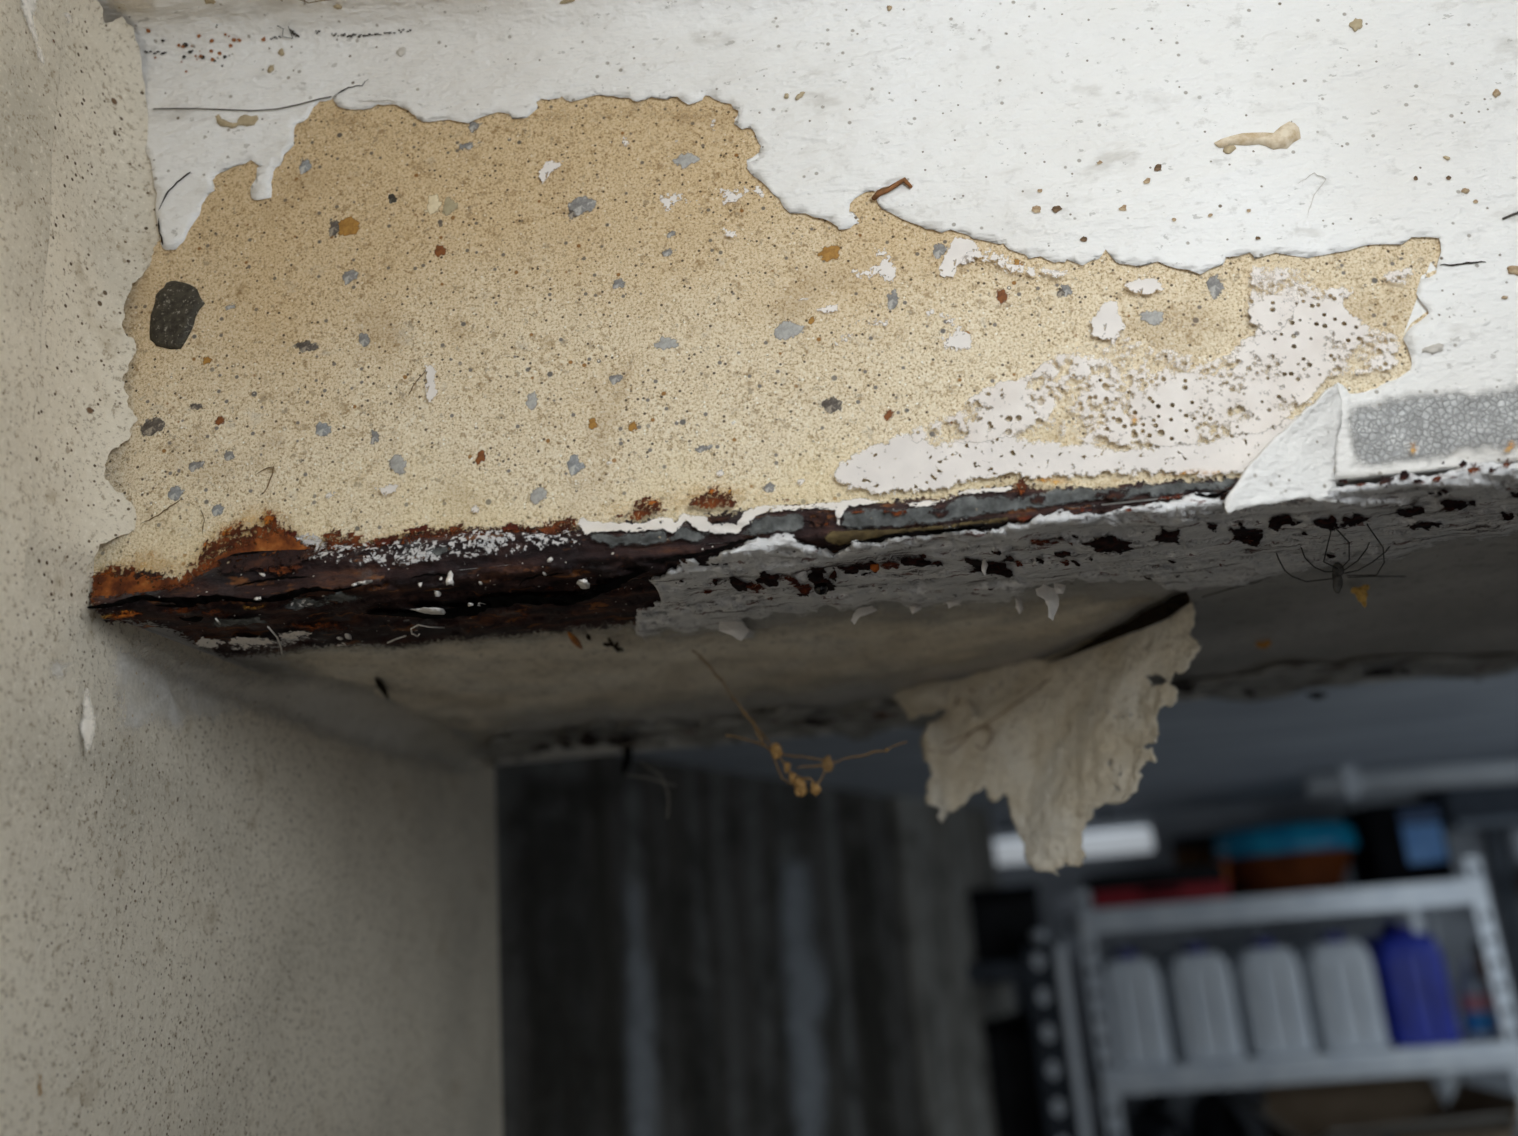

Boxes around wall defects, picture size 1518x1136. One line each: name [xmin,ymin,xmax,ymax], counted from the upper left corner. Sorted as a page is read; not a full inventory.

peeling [1349,18,1363,32]
corrosion [88,470,1240,662]
peeling [92,95,1518,875]